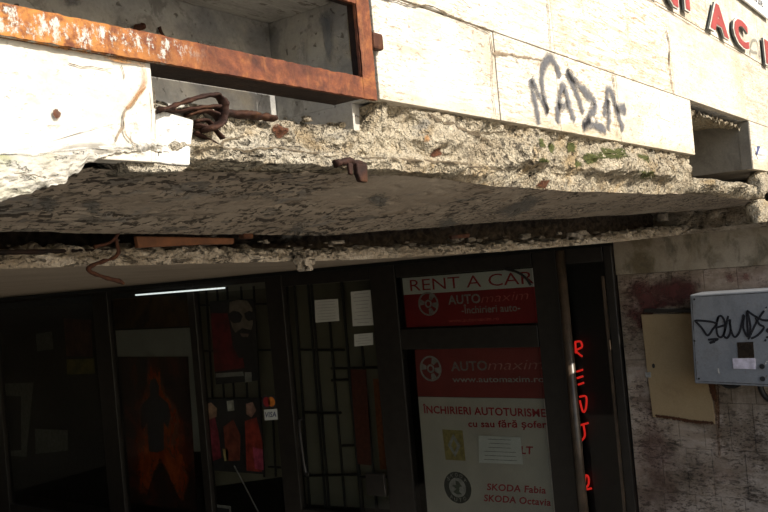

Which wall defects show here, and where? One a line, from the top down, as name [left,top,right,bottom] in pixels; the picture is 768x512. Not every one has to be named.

peeling [0,122,120,155]
crack [115,86,156,149]
corrosion [228,109,289,138]
spalling [153,92,757,220]
spalling [0,233,293,269]
spalling [310,224,691,261]